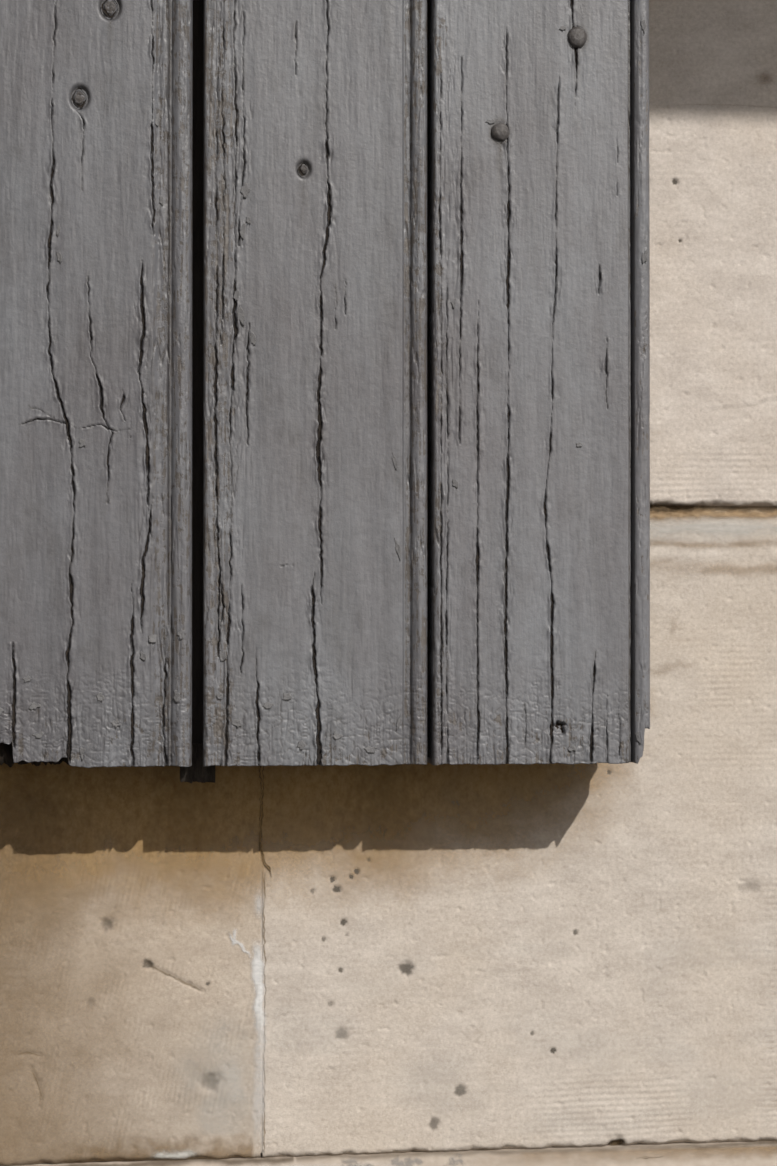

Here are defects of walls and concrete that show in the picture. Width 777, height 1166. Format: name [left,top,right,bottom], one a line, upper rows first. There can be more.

crack [28,0,167,763]
crack [214,11,272,1150]
crack [298,1,346,764]
crack [551,181,559,322]
crack [557,0,582,150]